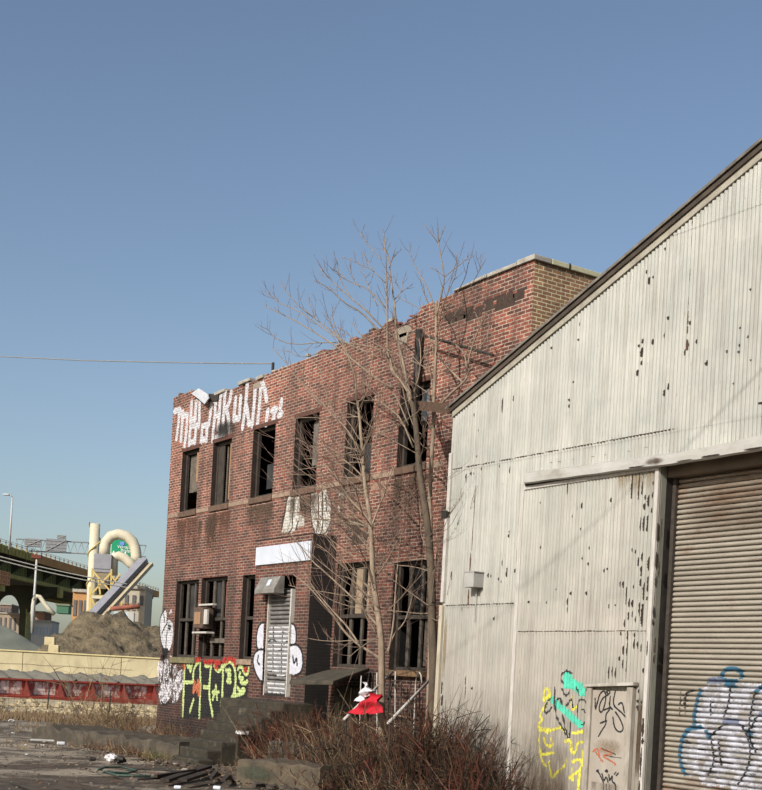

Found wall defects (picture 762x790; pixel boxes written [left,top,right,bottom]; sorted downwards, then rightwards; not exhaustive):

peeling [629,465,663,541]
peeling [608,548,660,635]
peeling [608,633,656,679]
peeling [636,689,644,790]